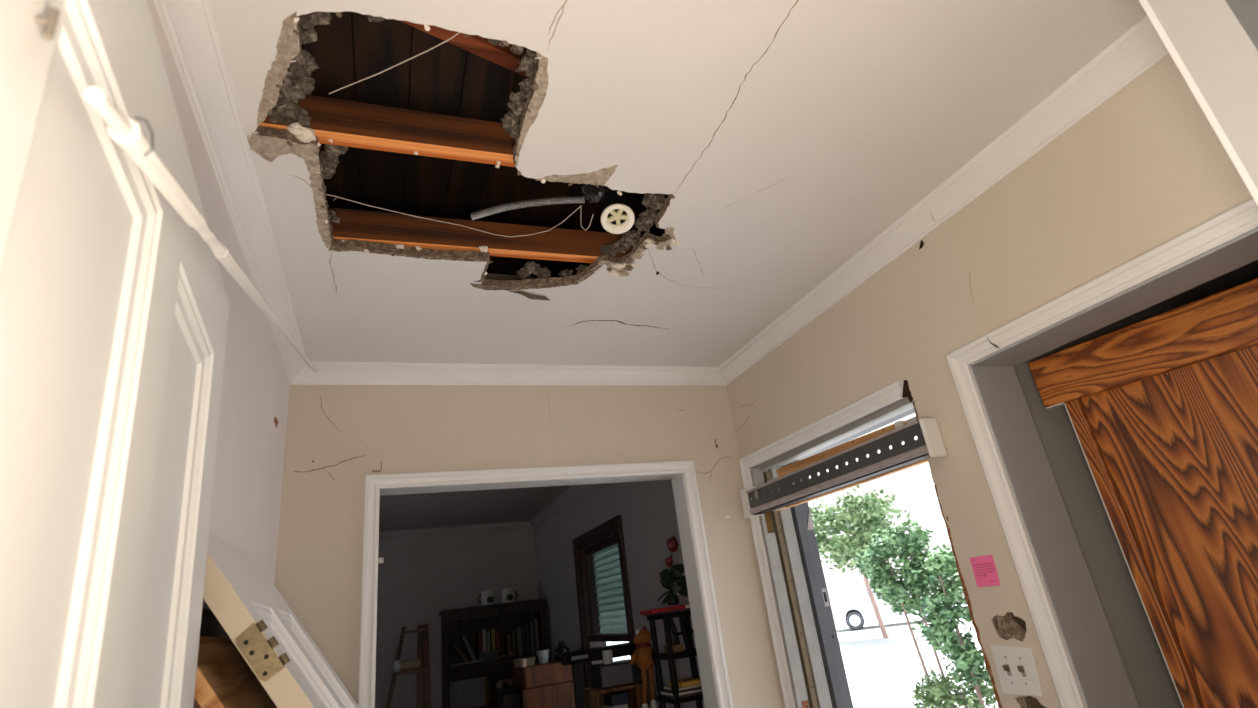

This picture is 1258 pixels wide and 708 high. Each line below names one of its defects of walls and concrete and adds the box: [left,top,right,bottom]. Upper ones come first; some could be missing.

crack [547,0,567,51]
crack [674,0,799,194]
flaking render [247,12,679,300]
crack [570,320,667,329]
crack [294,396,362,481]
flaking render [934,485,1003,708]
spalling [991,612,1027,642]
spalling [1015,695,1046,708]